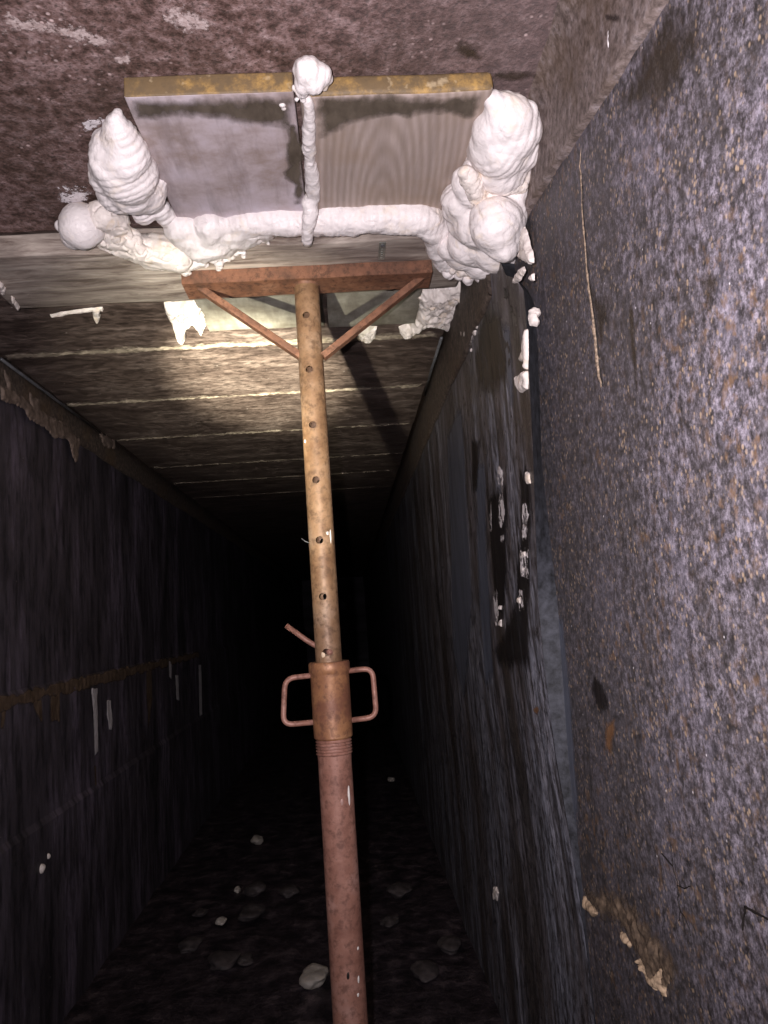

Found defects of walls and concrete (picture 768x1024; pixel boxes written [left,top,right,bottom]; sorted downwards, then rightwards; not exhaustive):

flaking render [0,370,81,462]
spalling [582,891,677,997]